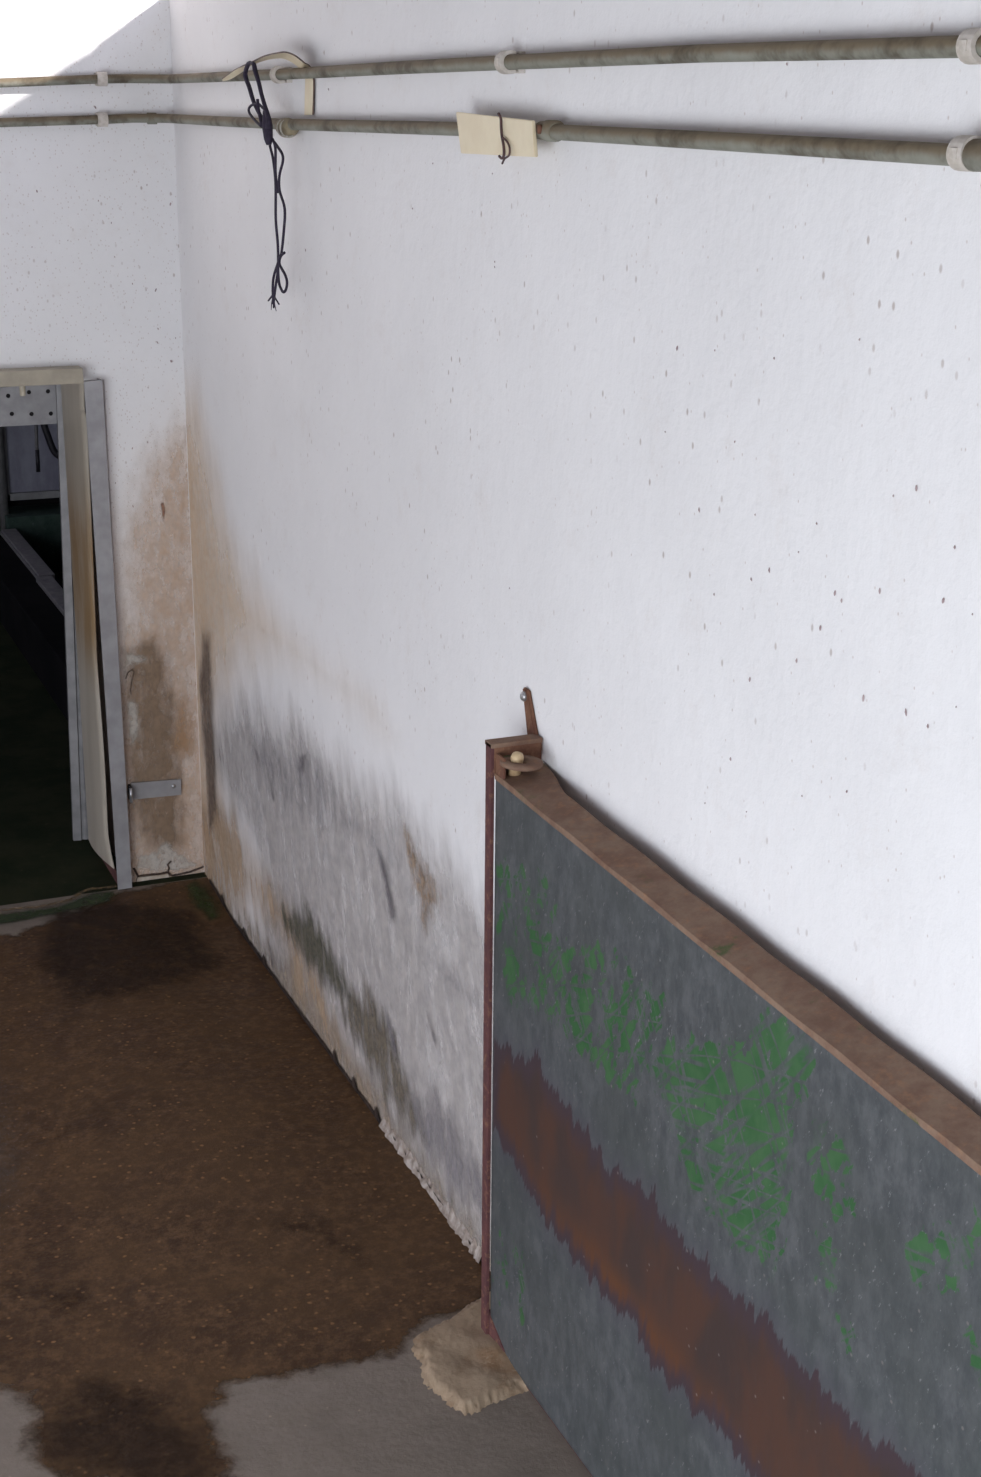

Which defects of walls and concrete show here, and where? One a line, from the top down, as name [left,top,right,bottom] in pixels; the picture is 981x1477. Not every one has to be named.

water stain [0,640,492,1477]